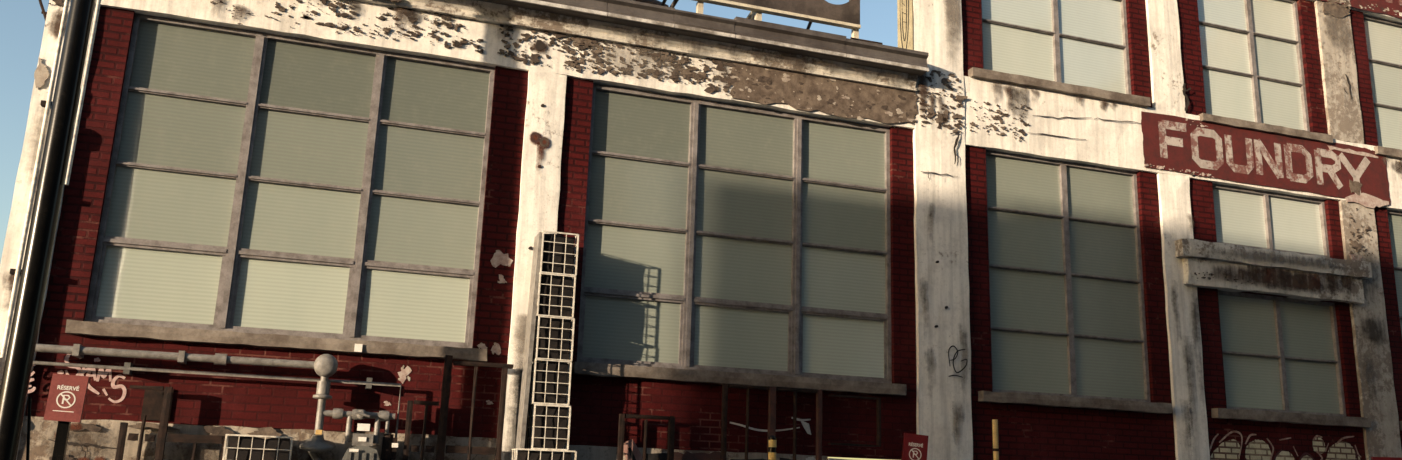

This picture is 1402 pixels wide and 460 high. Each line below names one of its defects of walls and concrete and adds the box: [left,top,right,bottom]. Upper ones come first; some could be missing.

peeling [48,0,71,38]
spalling [265,0,1011,135]